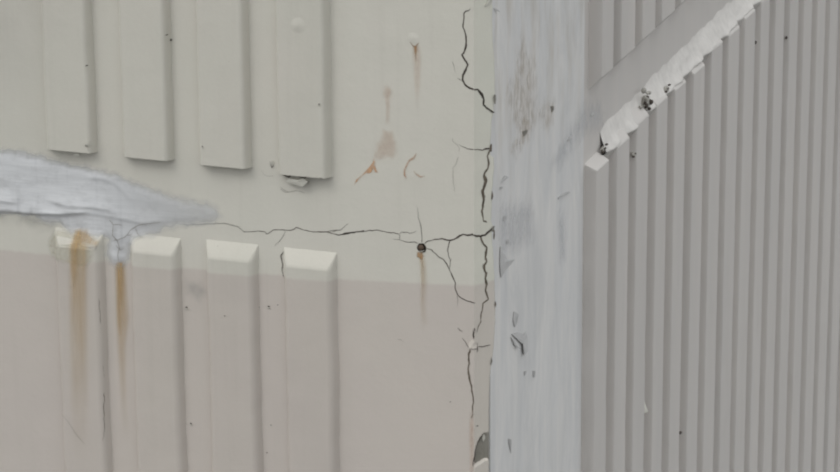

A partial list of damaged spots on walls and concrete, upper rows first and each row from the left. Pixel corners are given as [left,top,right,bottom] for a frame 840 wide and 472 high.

crack [452,9,495,113]
crack [184,139,495,418]
spalling [473,432,489,466]